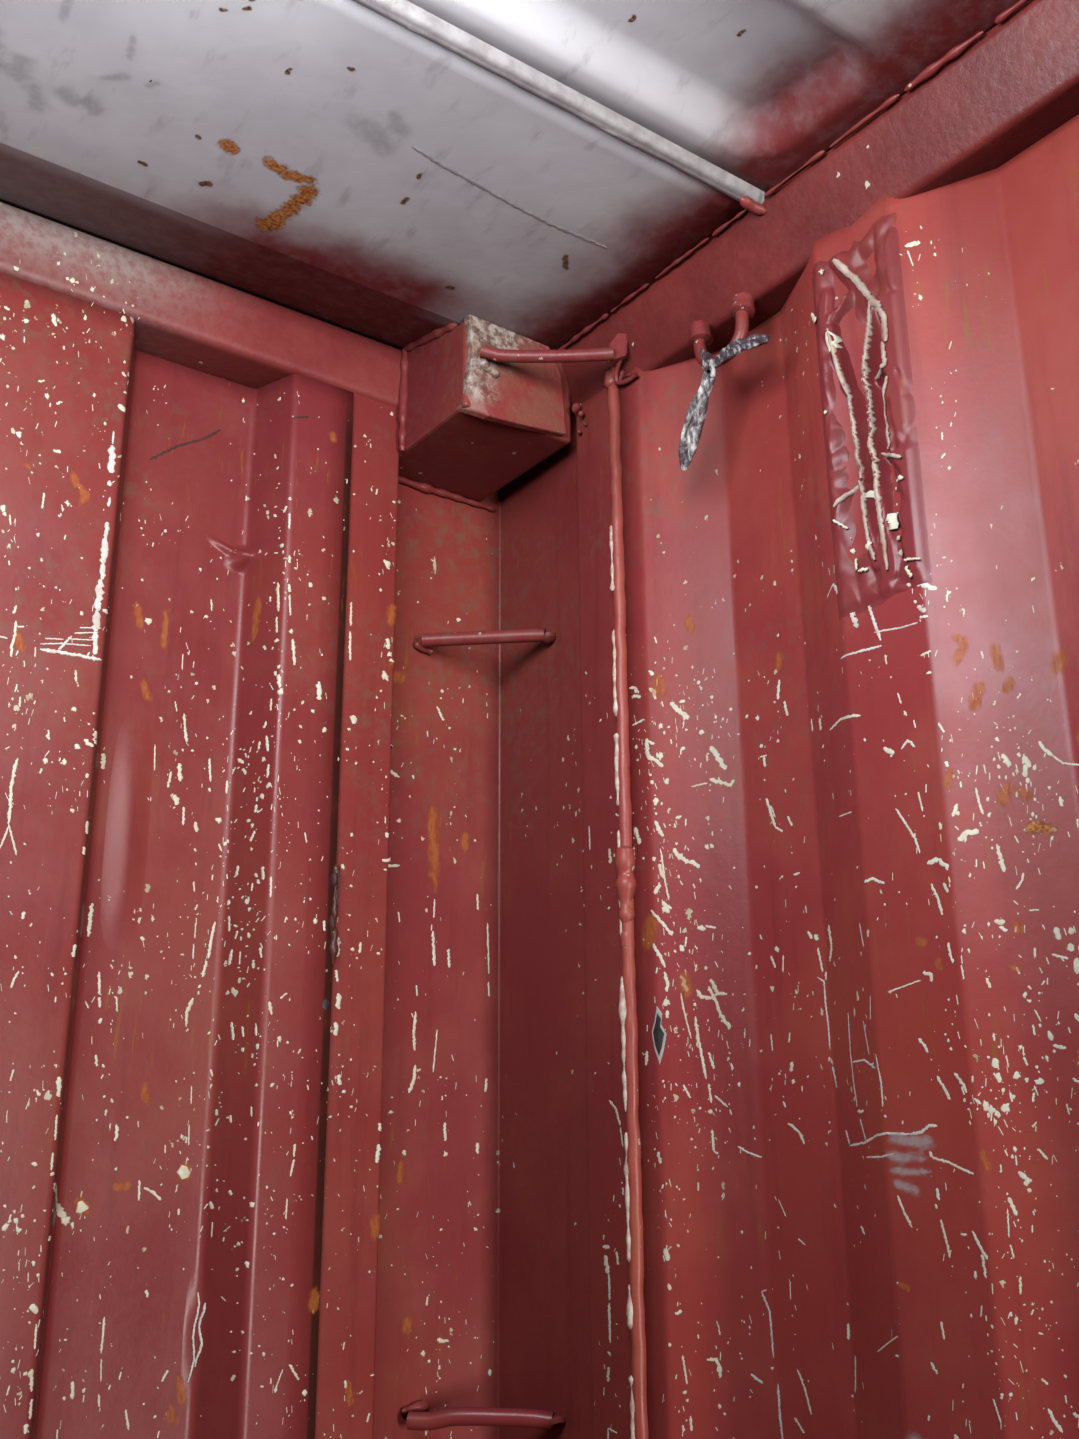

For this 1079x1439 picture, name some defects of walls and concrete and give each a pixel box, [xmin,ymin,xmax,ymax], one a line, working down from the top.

peeling [0,379,68,482]
peeling [49,249,105,384]
rust [218,140,239,154]
rust [256,158,317,232]
peeling [2,535,106,855]
peeling [1,896,139,1161]
peeling [138,454,382,1277]
peeling [356,896,488,1218]
peeling [610,637,770,1191]
peeling [841,475,1079,1439]
peeling [1,1051,107,1434]
peeling [662,1321,763,1439]